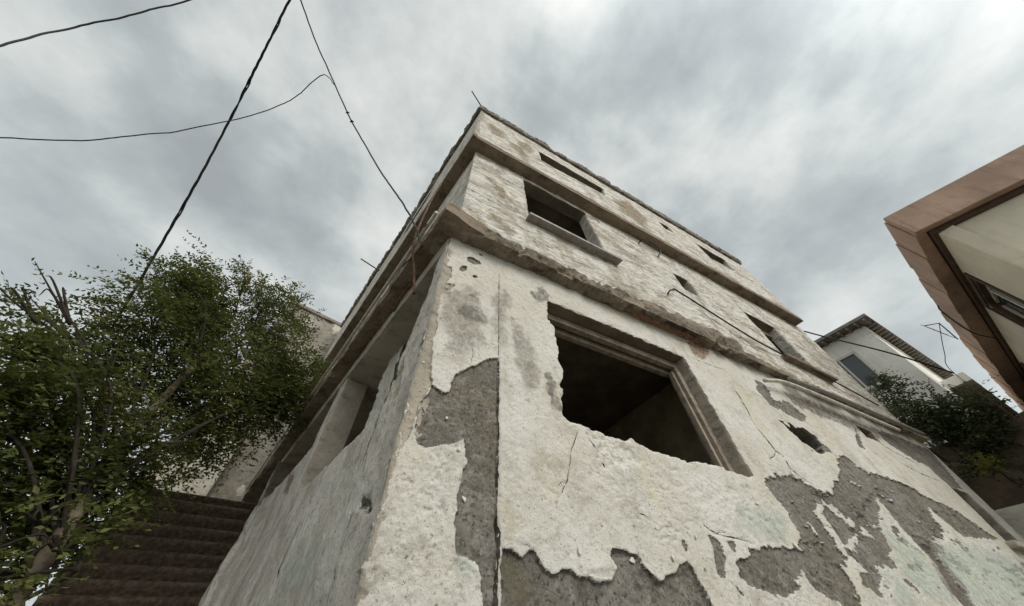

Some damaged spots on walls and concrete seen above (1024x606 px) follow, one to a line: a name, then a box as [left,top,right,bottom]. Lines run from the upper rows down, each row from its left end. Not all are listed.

flaking render [586,215,646,265]
flaking render [443,253,483,292]
crack [556,432,608,492]
flaking render [402,310,1024,606]
crack [735,390,813,484]